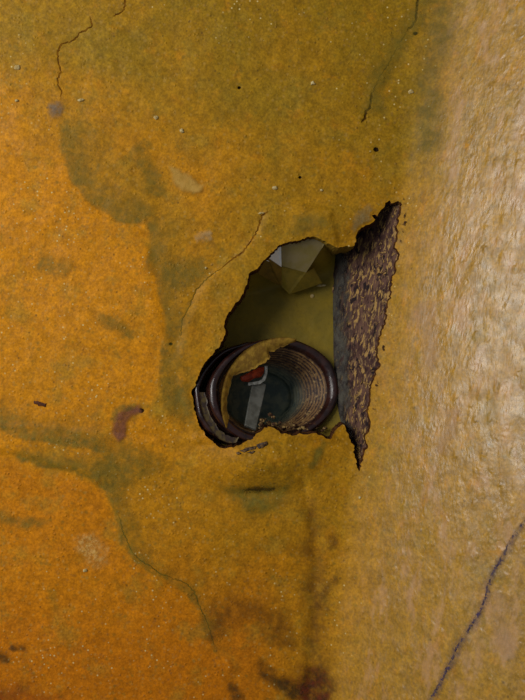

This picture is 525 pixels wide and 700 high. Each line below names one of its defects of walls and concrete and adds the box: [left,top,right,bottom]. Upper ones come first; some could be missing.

crack [57,17,93,96]
crack [362,0,419,122]
crack [180,211,268,334]
spalling [191,198,408,471]
crack [431,520,525,697]